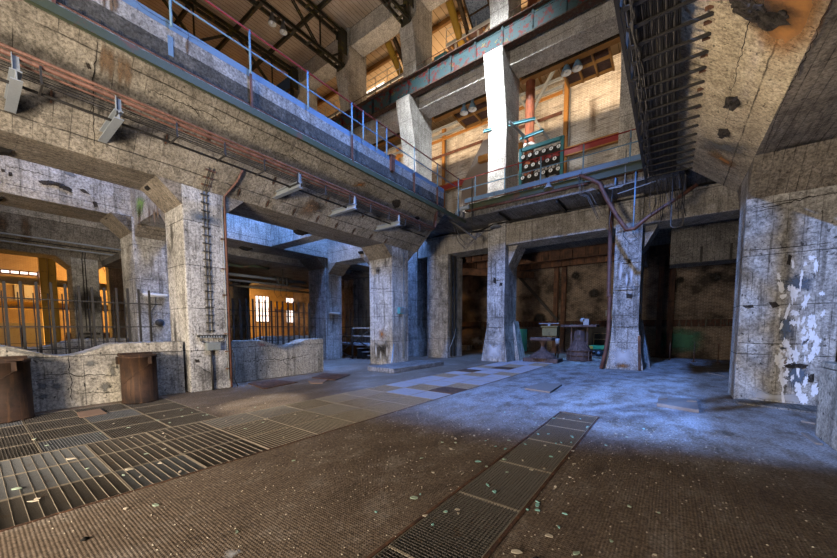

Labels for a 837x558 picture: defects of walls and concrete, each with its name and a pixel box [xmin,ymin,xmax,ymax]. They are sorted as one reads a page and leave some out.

spalling [729,0,791,31]
rust [758,0,818,48]
spalling [38,180,98,207]
peeling [769,255,826,404]